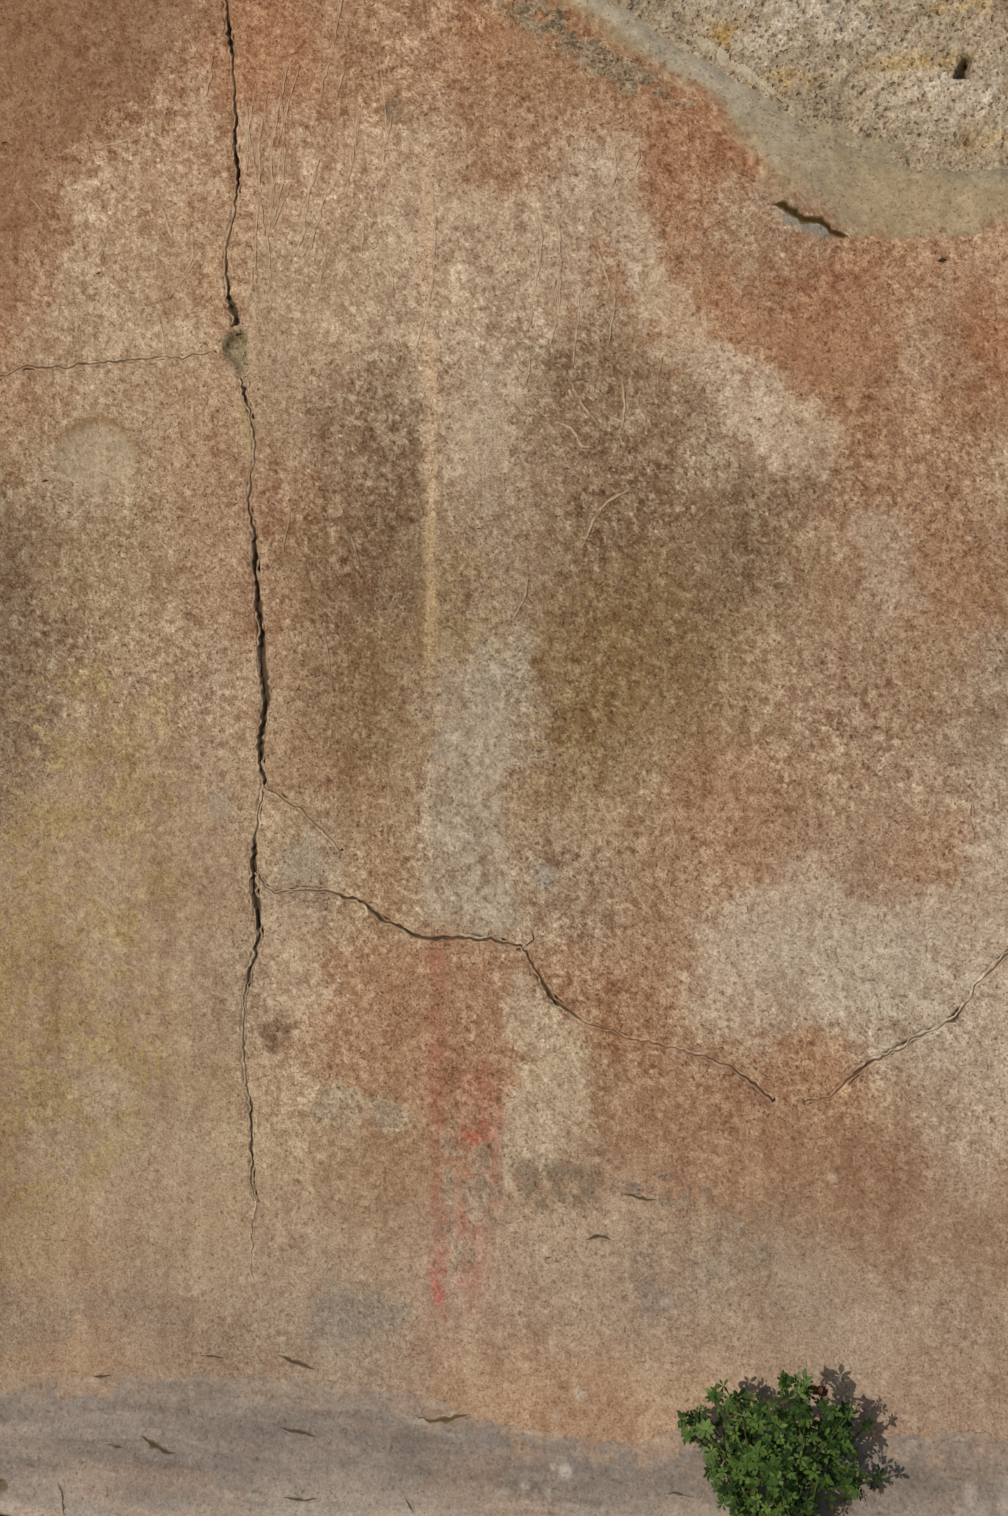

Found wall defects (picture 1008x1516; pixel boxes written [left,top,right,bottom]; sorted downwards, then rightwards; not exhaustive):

crack [0,0,244,379]
crack [238,376,1008,1288]